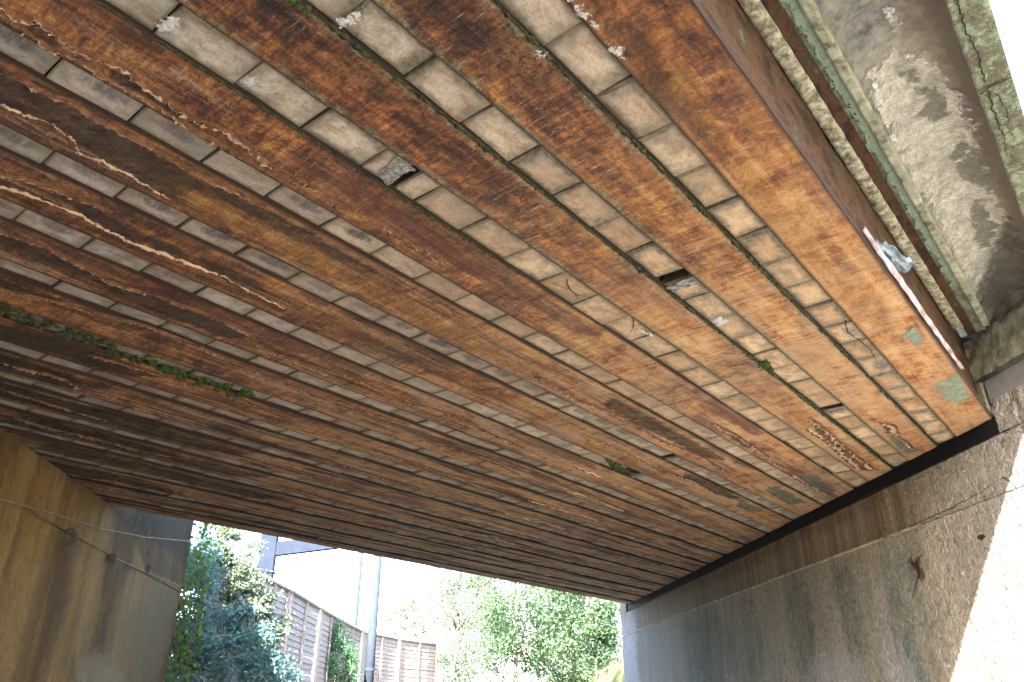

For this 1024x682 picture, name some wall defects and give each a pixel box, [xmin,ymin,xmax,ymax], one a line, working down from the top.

damp [155,16,180,32]
damp [331,6,363,29]
damp [567,0,665,88]
crack [956,0,1019,165]
spalling [378,157,420,186]
damp [864,47,1024,313]
spalling [661,268,697,293]